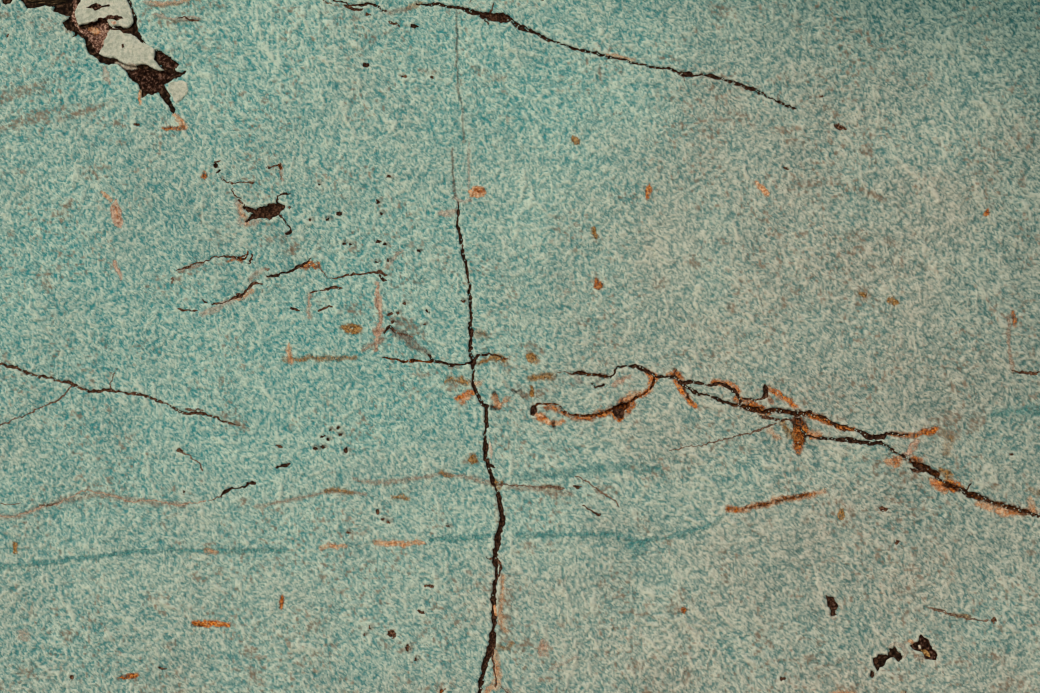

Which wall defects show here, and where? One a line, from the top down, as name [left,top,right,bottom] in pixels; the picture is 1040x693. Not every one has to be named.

flaking render [2,0,188,131]
crack [323,0,796,110]
spalling [231,188,292,235]
crack [171,251,388,316]
crack [0,362,240,426]
crack [382,151,619,693]
corrosion [534,368,697,428]
corrosion [726,492,820,512]
corrosion [711,380,855,454]
crack [530,364,1040,518]
corrosion [885,427,1035,516]
peeling [870,635,938,678]